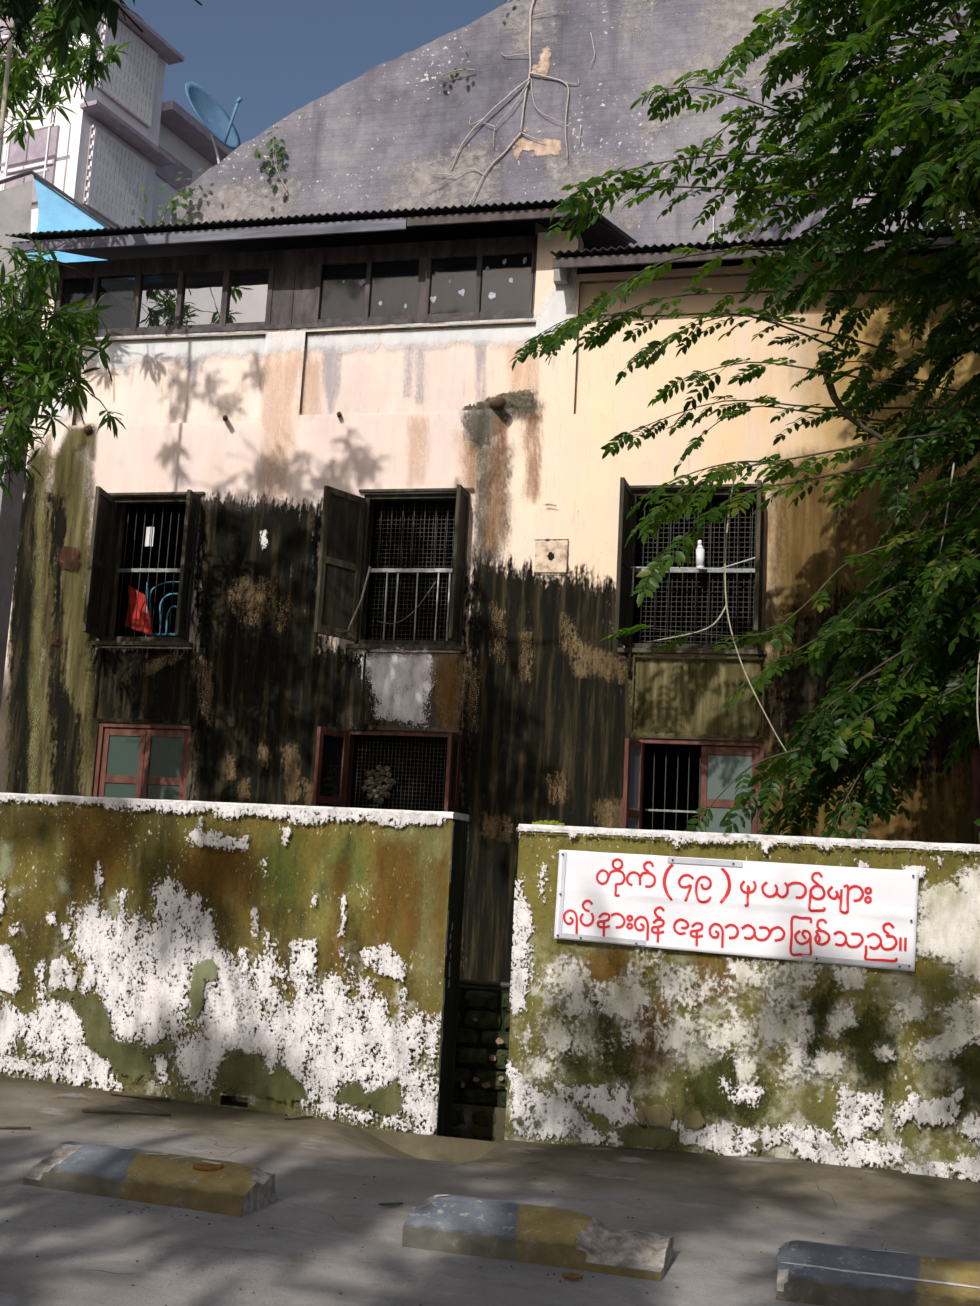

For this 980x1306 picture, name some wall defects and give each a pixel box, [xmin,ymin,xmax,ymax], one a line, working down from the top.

peeling [505,0,556,81]
flaking render [513,128,562,160]
water stain [6,438,386,834]
water stain [457,268,980,982]
water stain [392,825,442,980]
peeling [0,861,453,1136]
water stain [636,1000,671,1061]
water stain [692,958,733,1001]
peeling [461,825,980,1182]
water stain [794,980,839,1067]
water stain [684,1051,770,1124]
water stain [948,1039,980,1110]